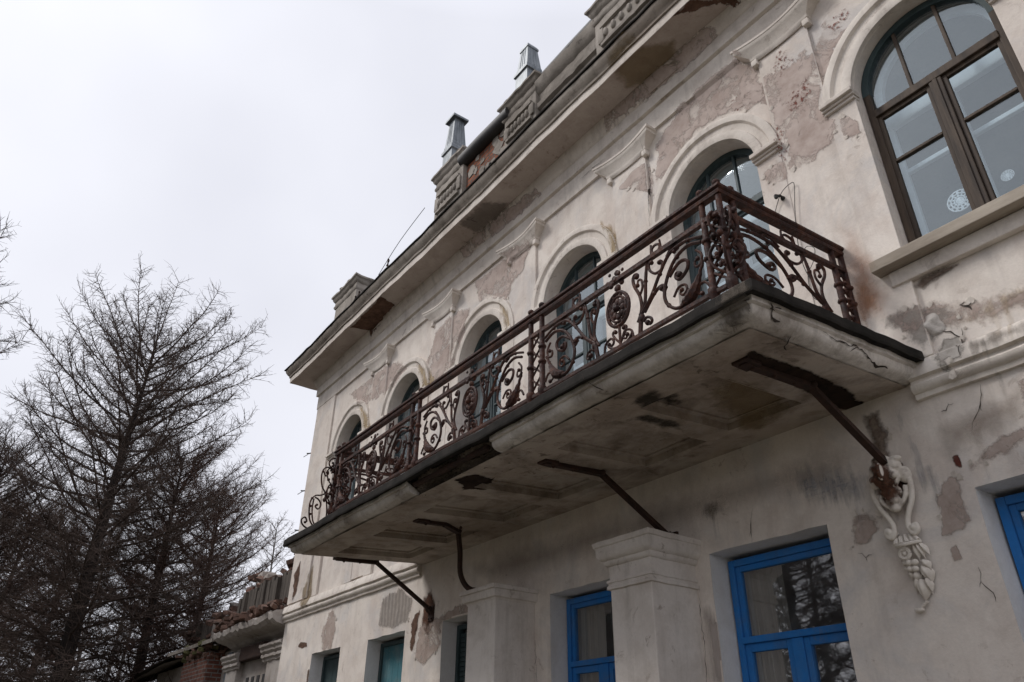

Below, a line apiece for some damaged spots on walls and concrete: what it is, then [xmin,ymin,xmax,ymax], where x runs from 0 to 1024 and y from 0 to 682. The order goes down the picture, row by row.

peeling [604,9,860,197]
peeling [460,187,541,257]
peeling [475,242,530,301]
crack [823,331,888,369]
peeling [889,292,1024,379]
leakage [636,392,679,427]
spalling [746,352,864,410]
spalling [411,441,501,495]
rust [869,461,901,504]
peeling [936,429,1024,535]
peeling [321,611,337,650]
peeling [379,588,468,664]